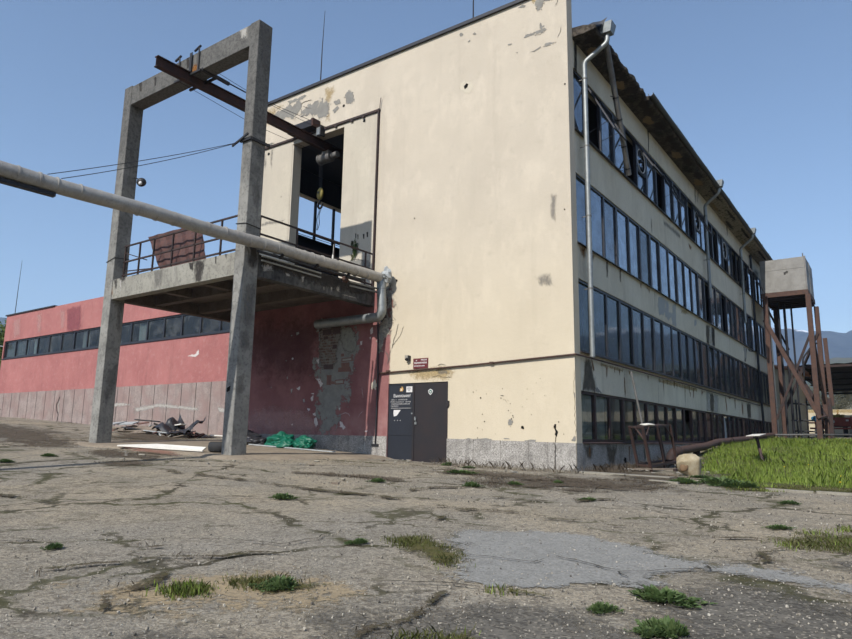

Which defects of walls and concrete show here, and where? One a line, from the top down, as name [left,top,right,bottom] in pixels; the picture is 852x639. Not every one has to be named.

peeling [275,90,354,122]
spalling [303,318,362,435]
damp [583,358,602,394]